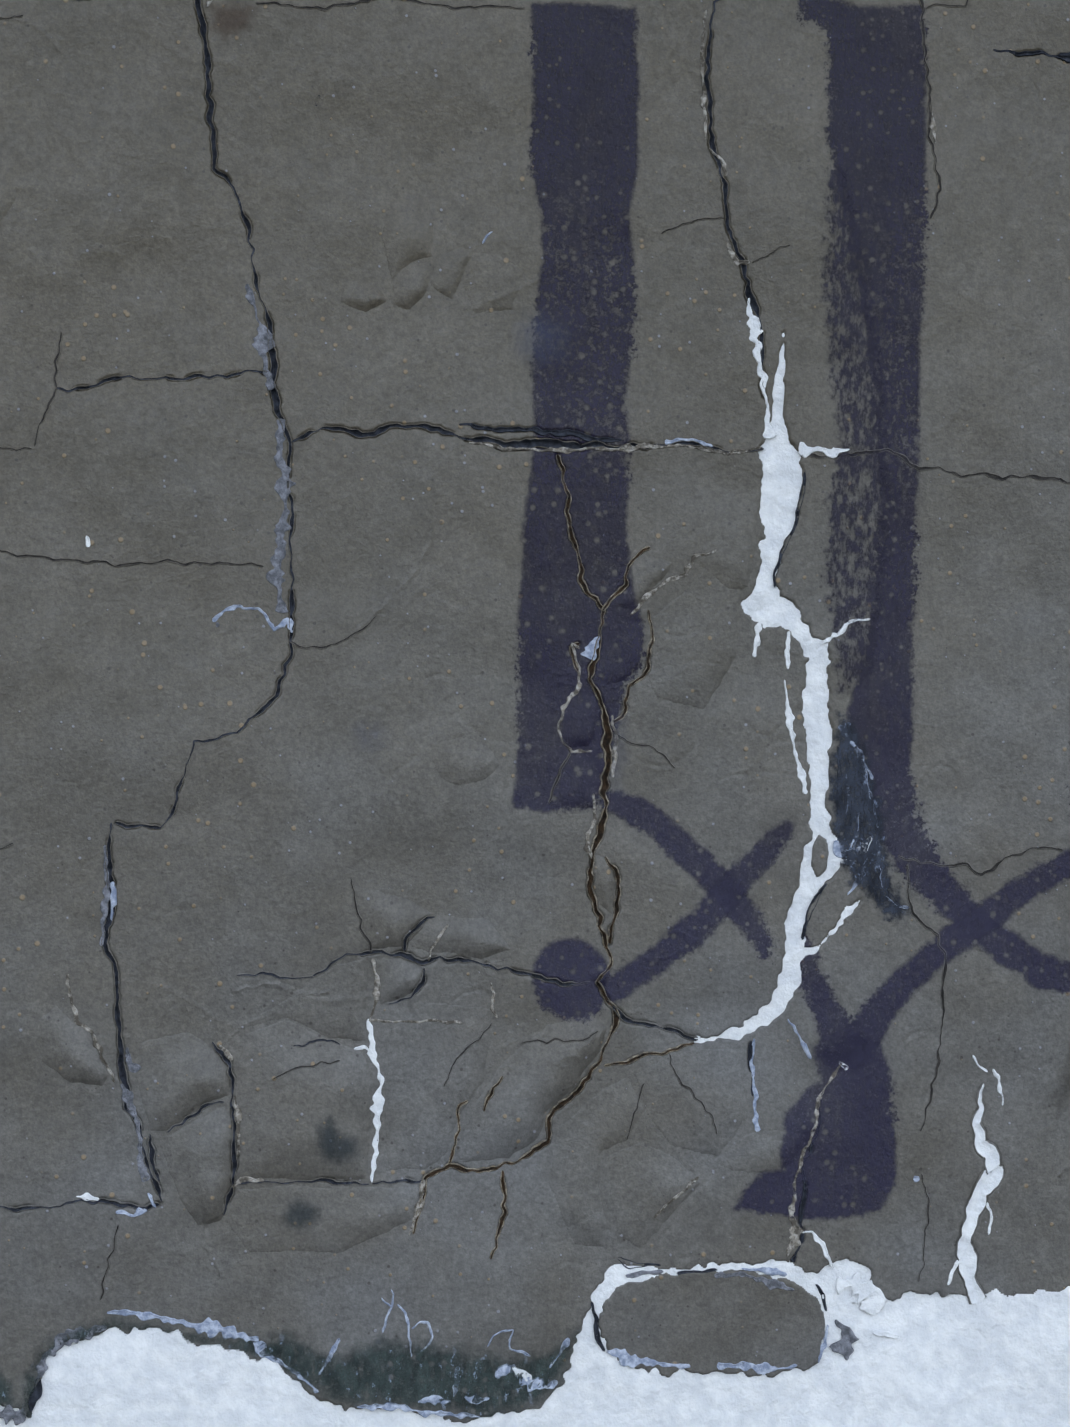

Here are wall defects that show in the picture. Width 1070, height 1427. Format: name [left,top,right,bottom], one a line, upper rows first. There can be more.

crack [919,0,969,219]
crack [993,49,1070,63]
crack [798,442,1070,484]
crack [0,0,791,1300]
flaking render [694,333,873,1043]
crack [786,1019,848,1268]
crack [897,846,1063,1304]
flaking render [0,1257,1070,1427]